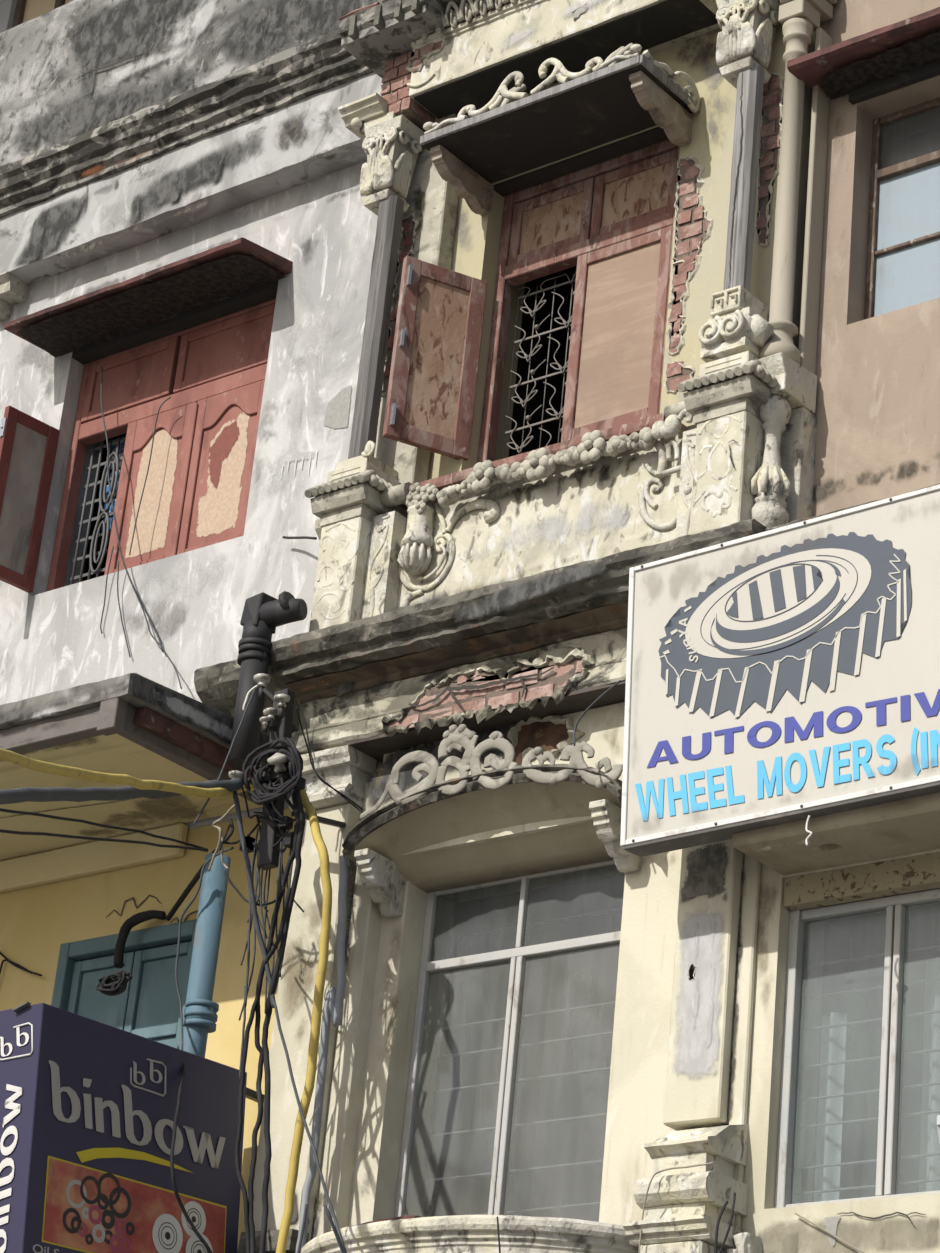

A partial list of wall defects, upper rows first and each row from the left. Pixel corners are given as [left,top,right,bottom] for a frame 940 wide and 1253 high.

damp [19,0,217,148]
damp [130,135,260,231]
damp [279,114,306,148]
spalling [756,72,784,247]
spalling [664,156,713,395]
damp [812,480,842,501]
damp [898,461,925,477]
spalling [381,648,592,765]
peeling [681,844,727,902]
crack [837,1212,926,1229]